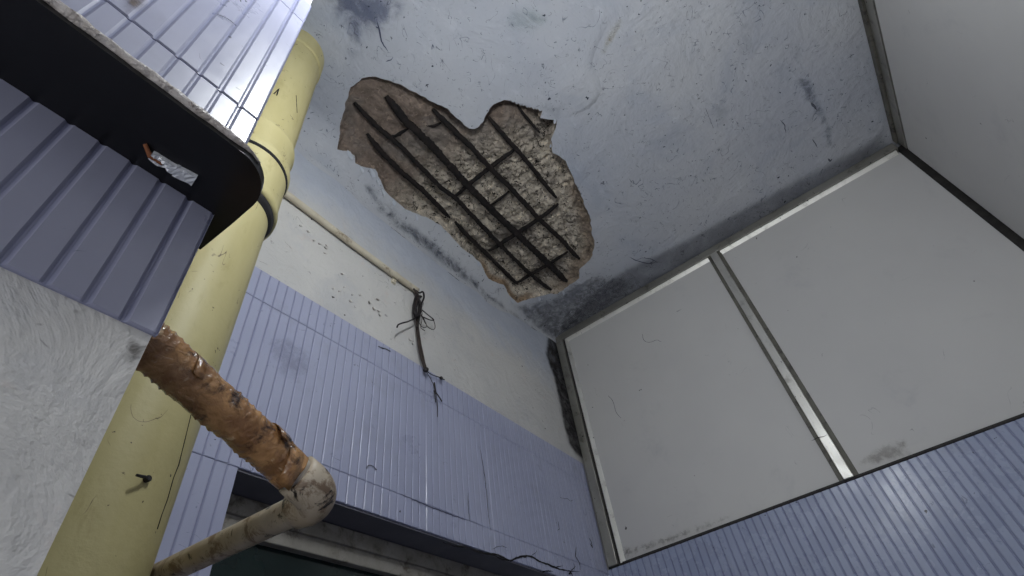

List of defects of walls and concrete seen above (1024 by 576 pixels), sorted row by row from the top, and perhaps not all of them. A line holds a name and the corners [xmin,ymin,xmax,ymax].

water stain [402,227,478,287]
spalling [337,77,595,304]
water stain [523,280,623,458]